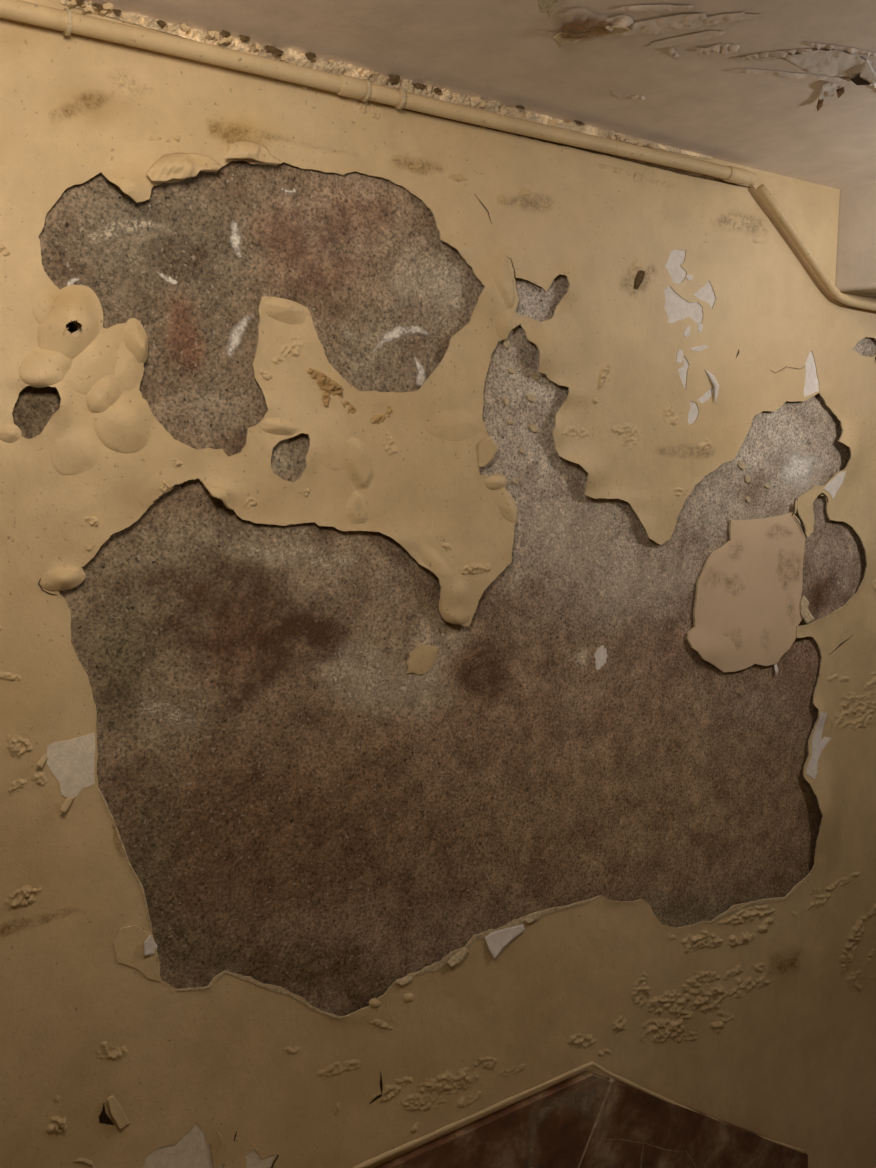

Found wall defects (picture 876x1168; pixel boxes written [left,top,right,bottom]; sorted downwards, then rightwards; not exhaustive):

spalling [61,0,712,159]
peeling [538,0,876,111]
spalling [39,127,484,456]
spalling [852,337,876,357]
damp [149,568,435,705]
spalling [0,249,867,1030]
peeling [144,1123,222,1168]